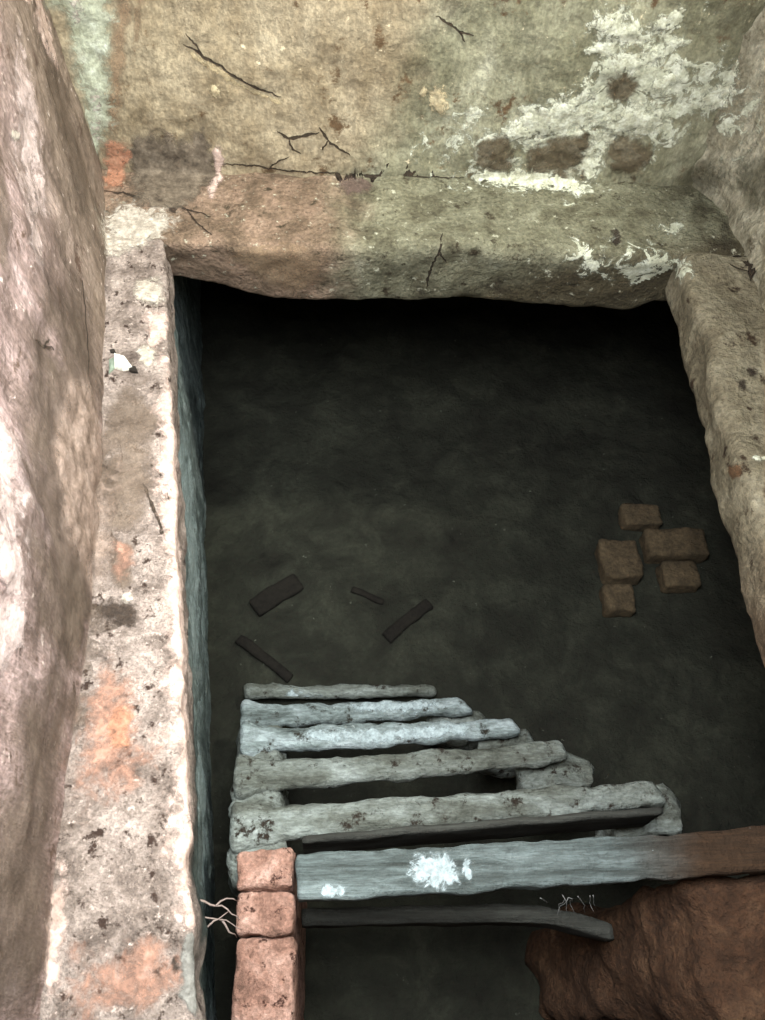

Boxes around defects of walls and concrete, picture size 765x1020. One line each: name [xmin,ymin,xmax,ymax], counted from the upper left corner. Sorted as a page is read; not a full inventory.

crack [183,34,281,104]
damp [410,13,763,193]
crack [212,127,464,182]
damp [651,222,684,235]
damp [562,237,694,284]